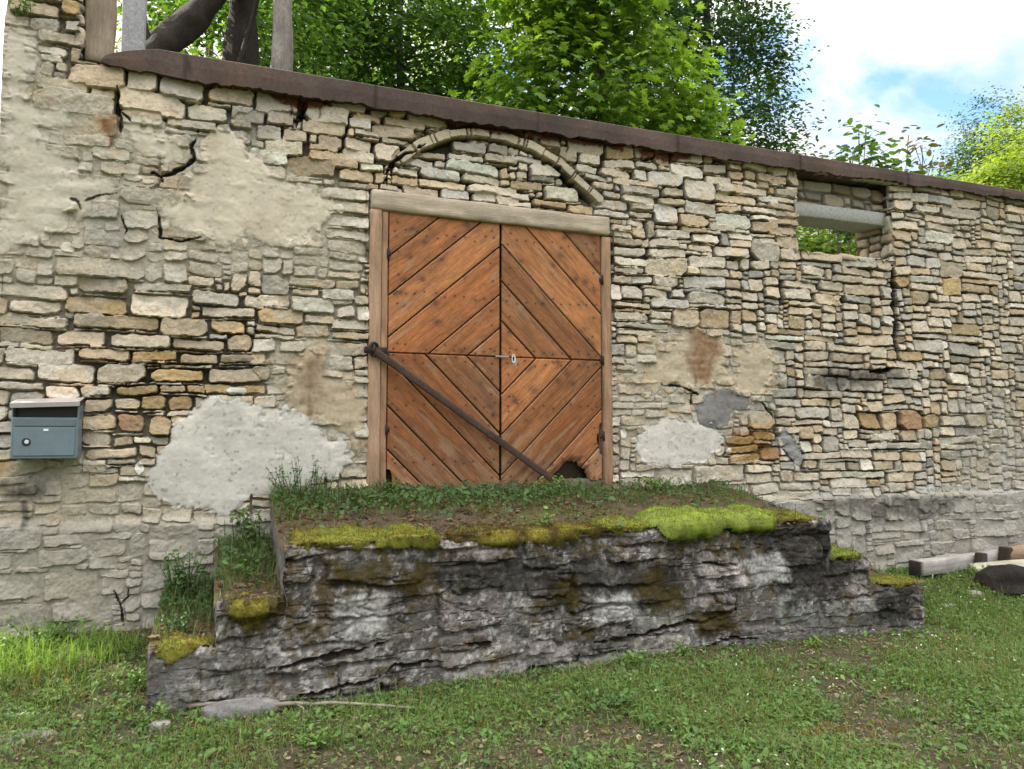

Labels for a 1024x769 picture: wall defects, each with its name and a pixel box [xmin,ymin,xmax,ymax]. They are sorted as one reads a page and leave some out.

crack [116,86,131,133]
crack [151,131,199,182]
crack [70,193,128,232]
crack [158,215,201,243]